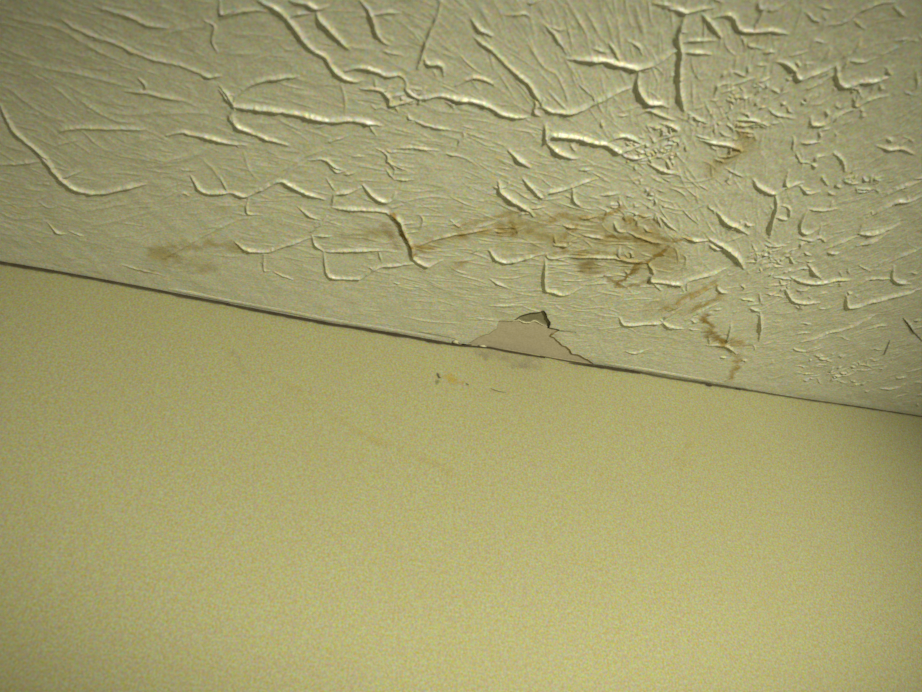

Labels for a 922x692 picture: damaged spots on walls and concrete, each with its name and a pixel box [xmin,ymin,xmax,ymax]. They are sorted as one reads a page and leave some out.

water stain [391,213,433,258]
water stain [604,230,682,287]
peeling [452,311,593,364]